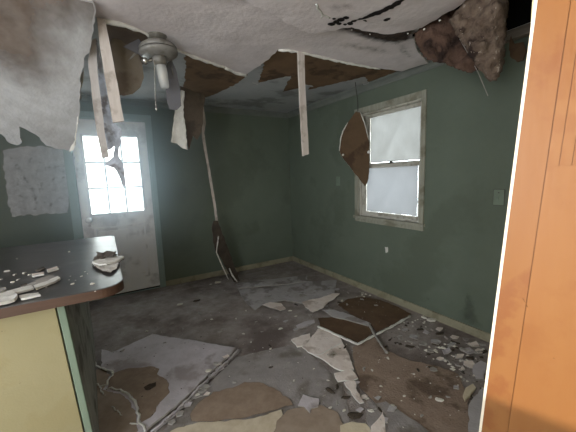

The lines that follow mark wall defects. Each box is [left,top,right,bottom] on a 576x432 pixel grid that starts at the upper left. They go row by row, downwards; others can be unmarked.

spalling [101,18,149,47]
leakage [328,0,415,42]
spalling [177,49,248,99]
spalling [252,49,396,92]